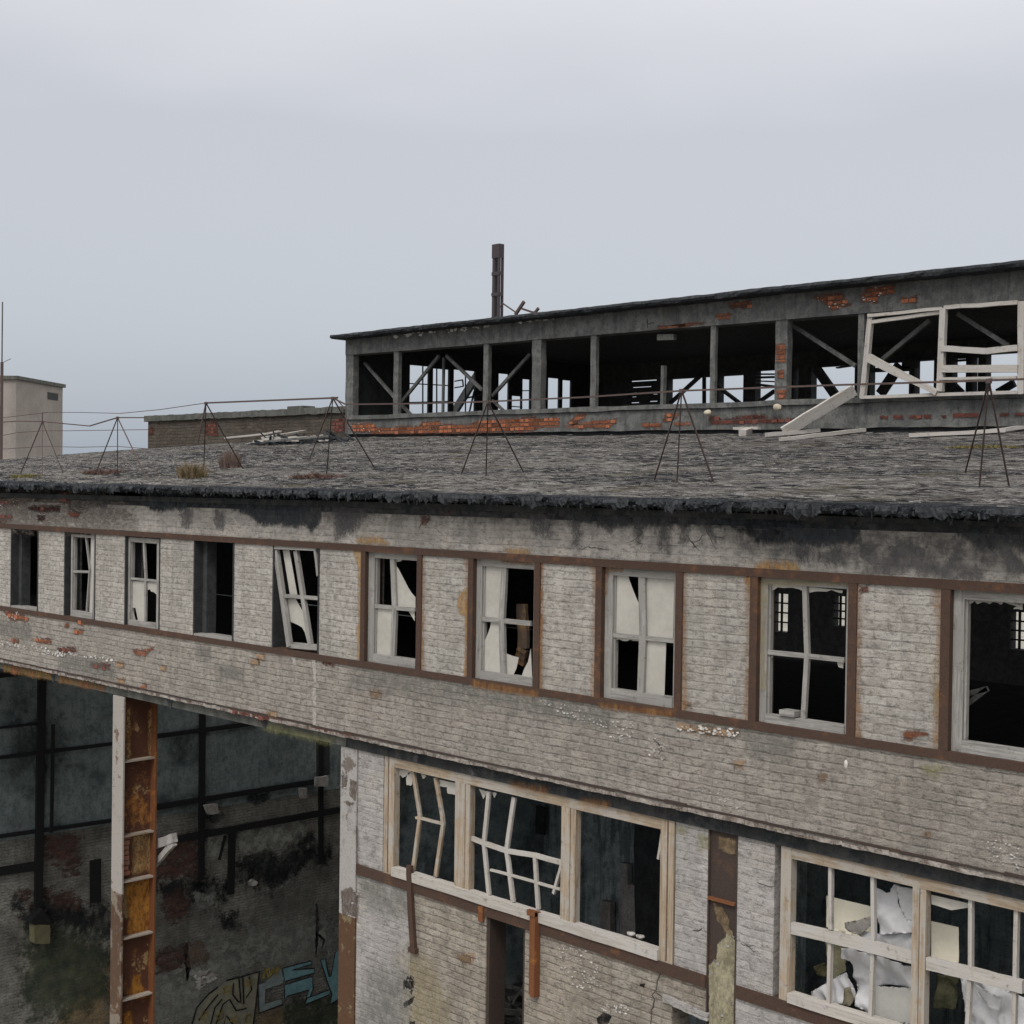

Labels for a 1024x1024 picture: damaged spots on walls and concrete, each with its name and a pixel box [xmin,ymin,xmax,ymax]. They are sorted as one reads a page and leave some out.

spalling [812,284,918,311]
spalling [105,413,720,496]
spalling [0,637,125,684]
peeling [340,774,357,806]
corrosion [126,834,150,937]
peeling [341,888,359,917]
corrosion [123,974,147,1024]
peeling [708,930,735,1024]